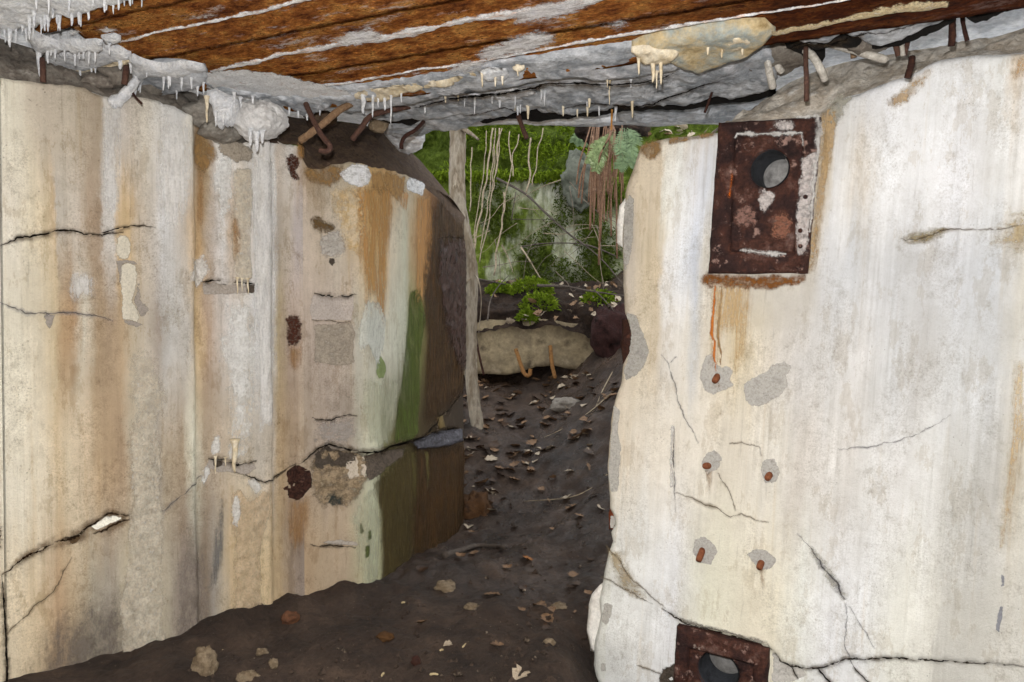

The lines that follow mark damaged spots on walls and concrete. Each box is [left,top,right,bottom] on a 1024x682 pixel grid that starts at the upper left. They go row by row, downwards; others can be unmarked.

spalling [321,17,1024,155]
crack [1,225,156,246]
leakage [0,0,847,435]
rust [702,109,836,369]
crack [902,220,1024,249]
crack [2,511,130,681]
rust [283,465,312,543]
spalling [311,446,404,506]
spalling [693,537,717,564]
crack [664,357,765,522]
spalling [700,354,791,406]
crack [776,537,1024,682]